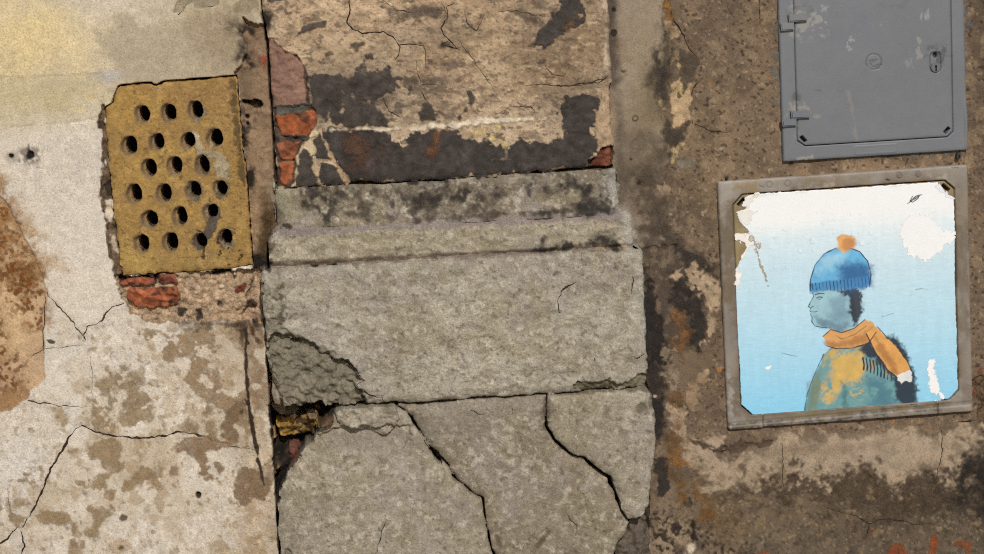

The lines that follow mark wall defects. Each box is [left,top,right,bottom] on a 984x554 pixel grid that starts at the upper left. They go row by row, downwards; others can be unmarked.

flaking render [243,38,546,188]
crack [346,0,541,104]
crack [497,66,608,114]
peeling [587,84,620,208]
flaking render [97,104,264,324]
crack [0,292,250,554]
spalling [268,332,383,502]
damp [654,457,670,497]
damp [647,513,734,554]
damp [760,458,962,523]